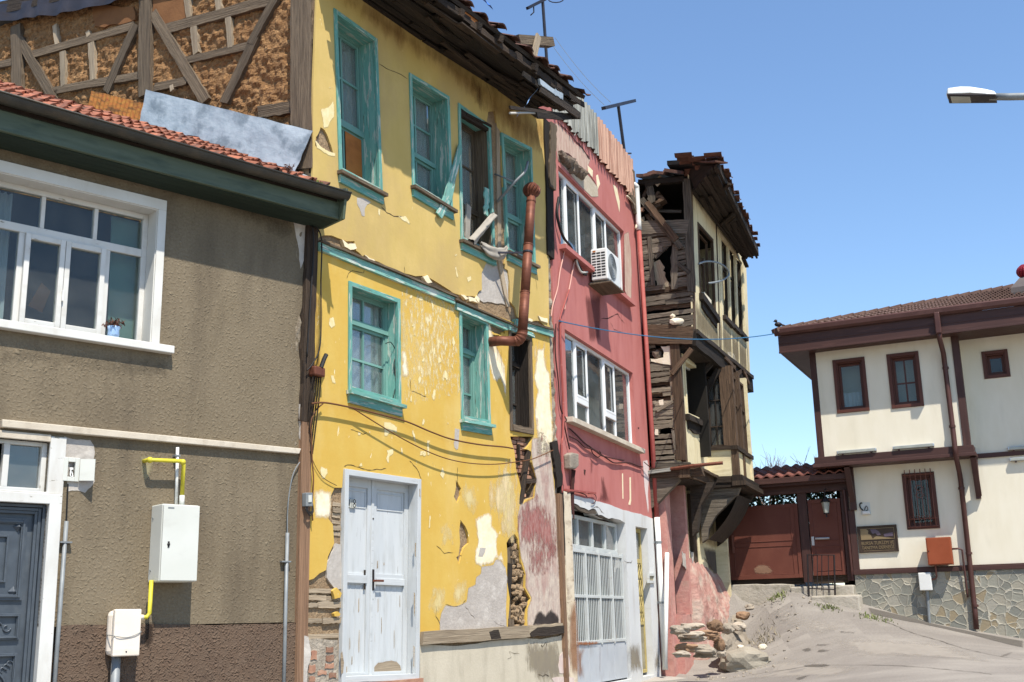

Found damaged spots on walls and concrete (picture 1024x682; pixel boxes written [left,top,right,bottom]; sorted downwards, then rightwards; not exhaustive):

peeling [321,102,334,128]
peeling [556,123,600,197]
flaking render [339,239,375,261]
flaking render [402,254,509,403]
peeling [384,422,397,436]
peeling [315,467,331,518]
peeling [440,344,613,630]